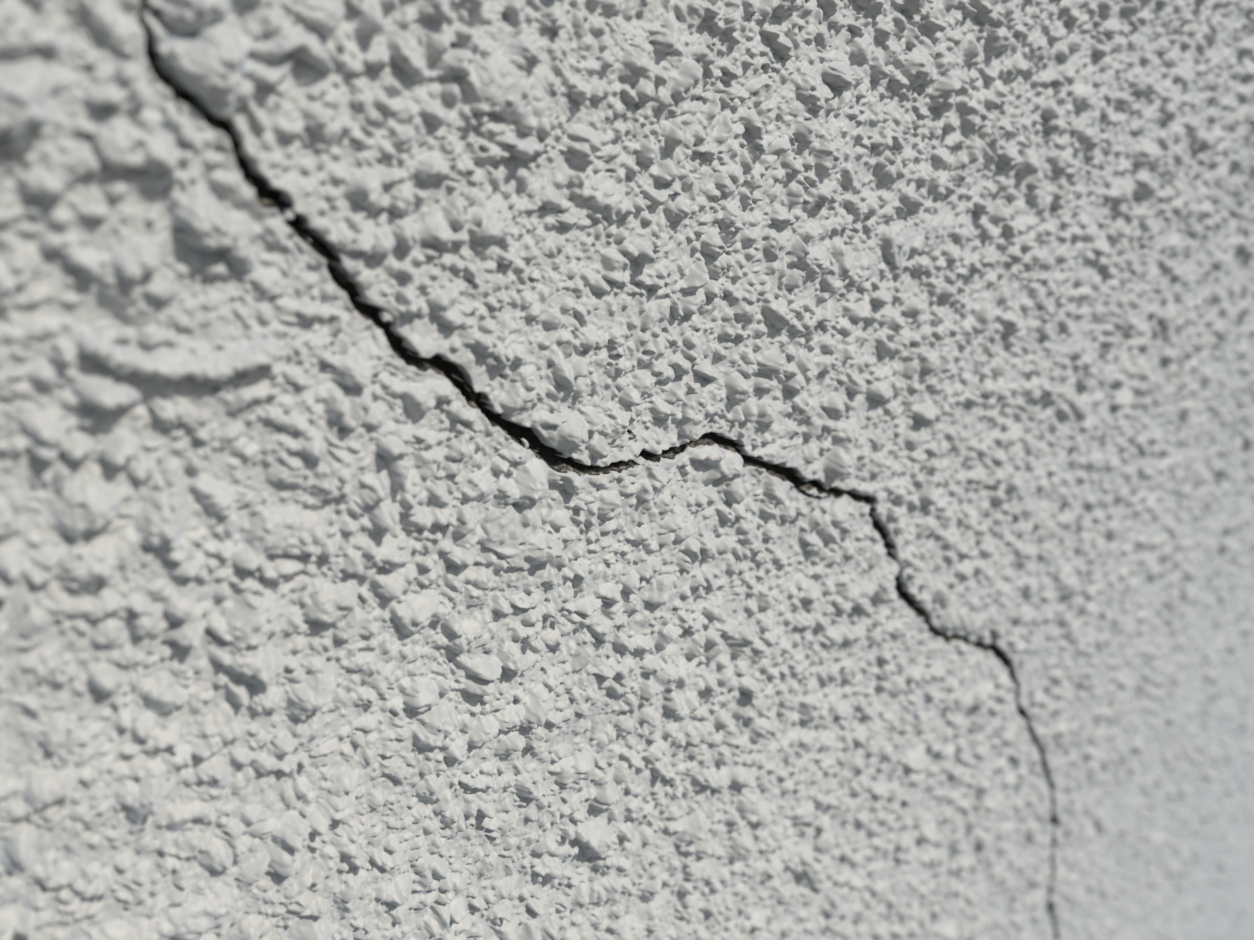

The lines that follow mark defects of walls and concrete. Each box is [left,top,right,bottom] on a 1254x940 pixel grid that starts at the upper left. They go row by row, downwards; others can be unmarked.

crack [137,0,1060,940]